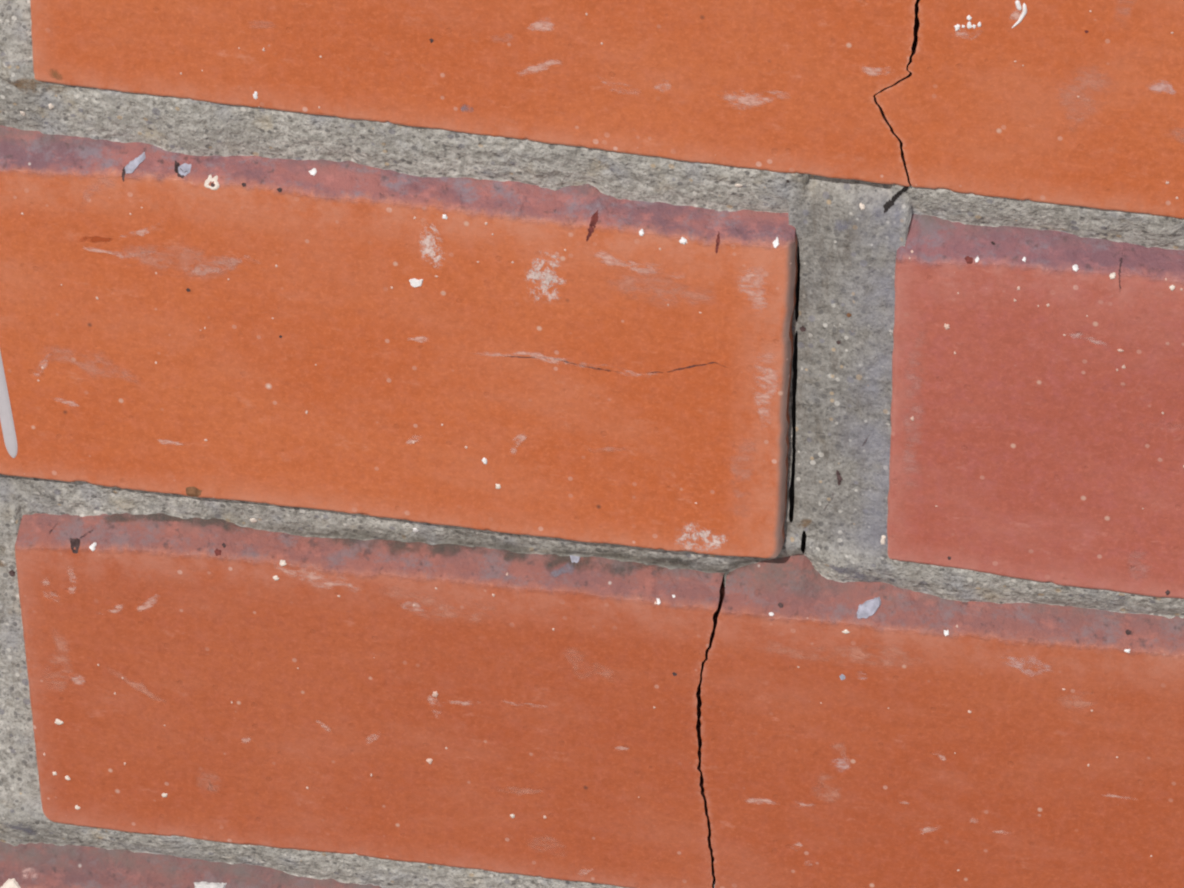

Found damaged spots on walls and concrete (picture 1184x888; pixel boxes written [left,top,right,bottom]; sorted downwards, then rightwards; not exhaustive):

crack [873,0,920,213]
crack [696,574,728,888]